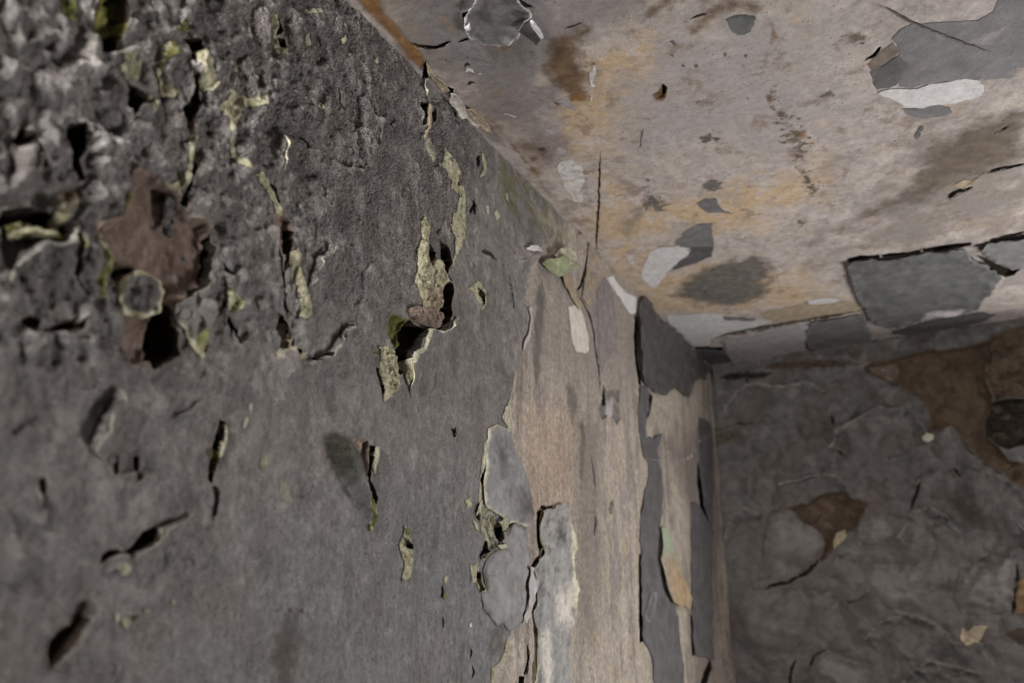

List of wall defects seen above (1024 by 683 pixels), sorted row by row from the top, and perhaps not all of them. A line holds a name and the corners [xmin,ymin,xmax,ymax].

spalling [88,0,134,55]
peeling [460,0,543,47]
peeling [420,60,492,133]
peeling [865,0,1024,140]
spalling [8,122,54,187]
spalling [62,119,96,186]
spalling [0,165,218,373]
peeling [256,171,337,349]
damp [681,257,771,304]
spalling [385,240,487,398]
peeling [465,198,1024,683]
spalling [97,513,195,581]